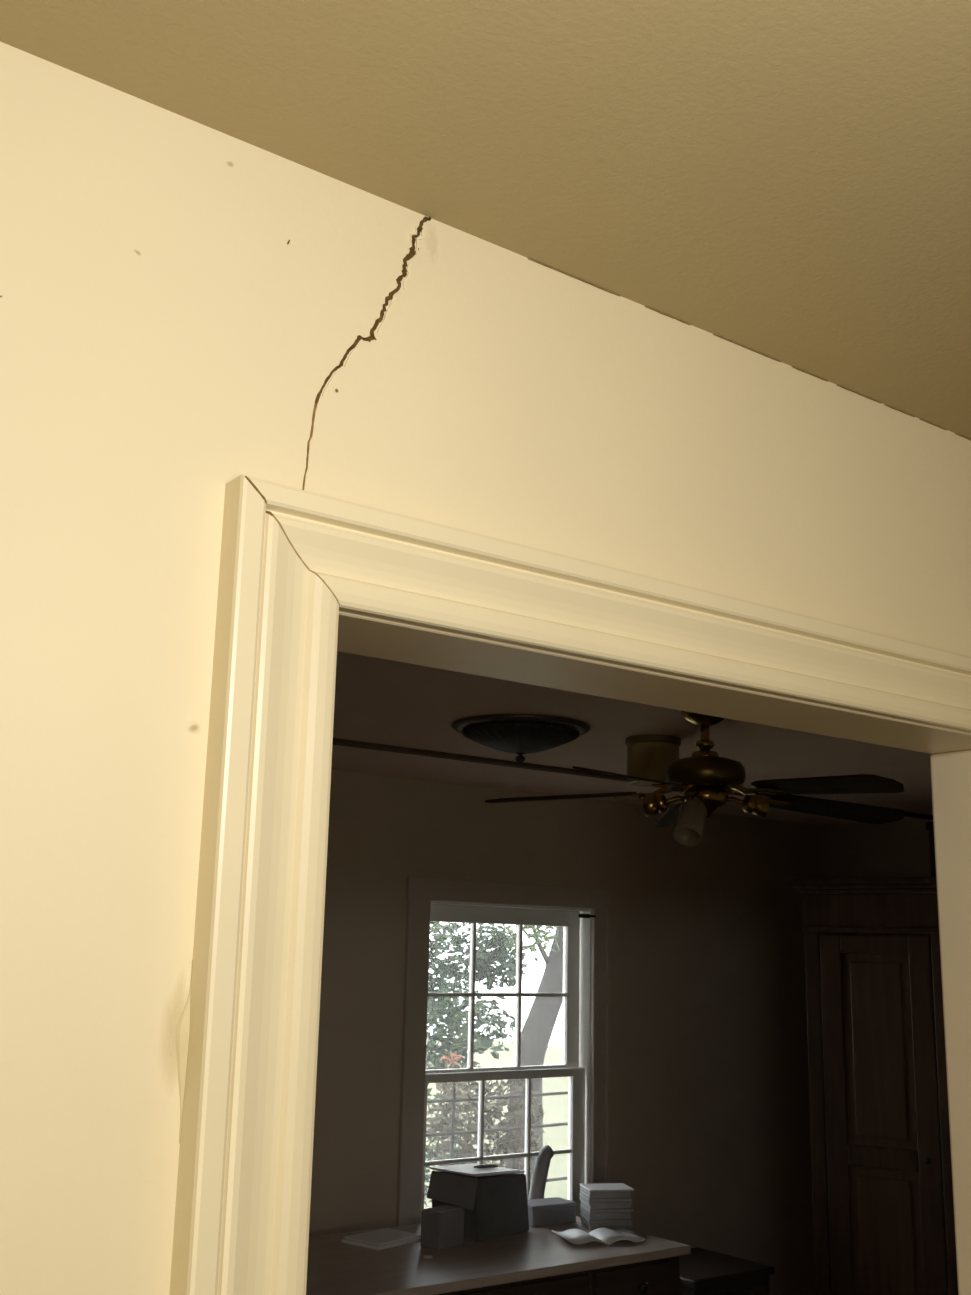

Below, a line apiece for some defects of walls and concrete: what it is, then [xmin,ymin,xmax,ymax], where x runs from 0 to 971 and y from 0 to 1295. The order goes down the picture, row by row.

crack [302,216,431,490]
crack [245,476,340,605]